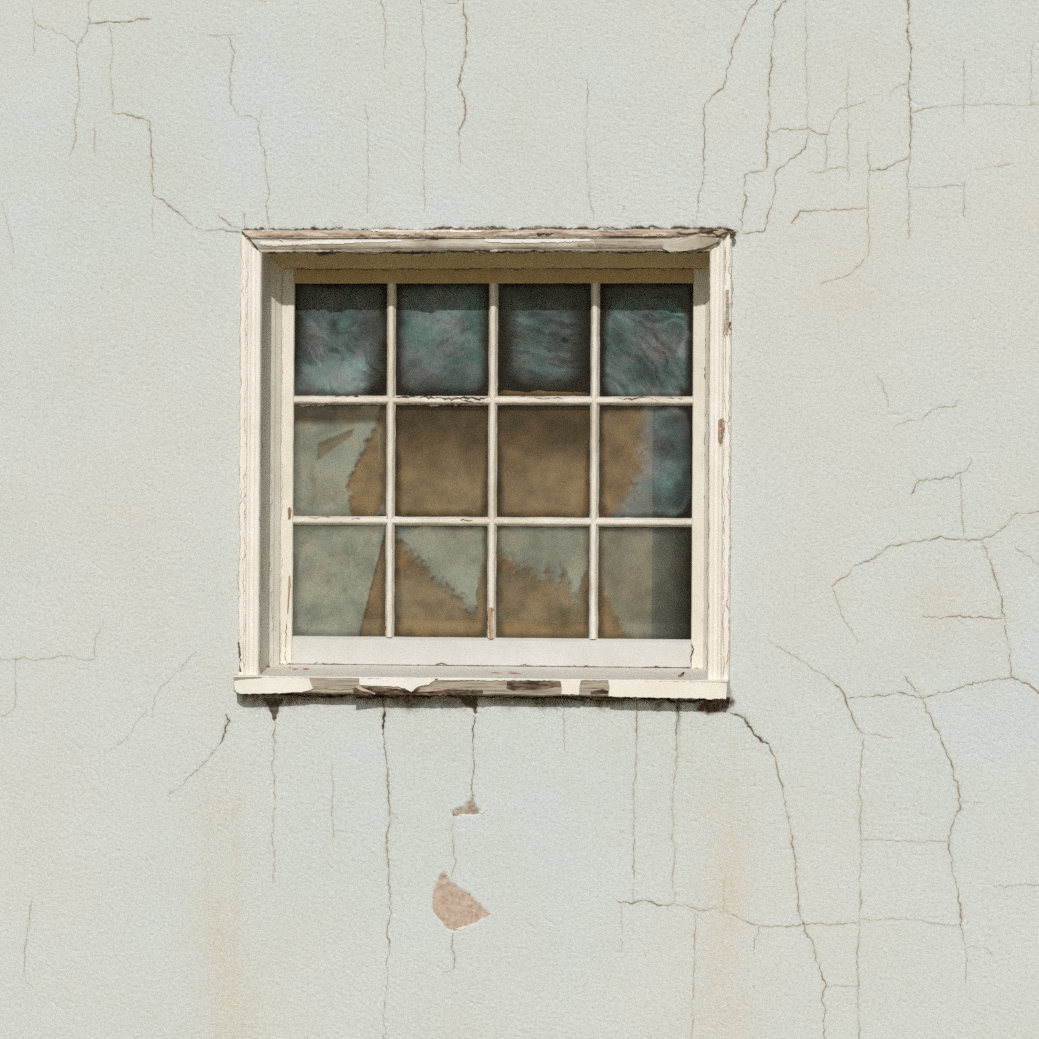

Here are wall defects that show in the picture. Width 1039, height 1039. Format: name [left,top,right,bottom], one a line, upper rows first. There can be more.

crack [34,5,149,76]
crack [110,34,270,232]
crack [452,1,467,162]
crack [696,0,987,284]
crack [382,694,399,1039]
spalling [433,871,490,931]
spalling [460,696,478,714]
spalling [451,794,488,816]
peeling [359,678,727,699]
crack [615,459,1039,1037]